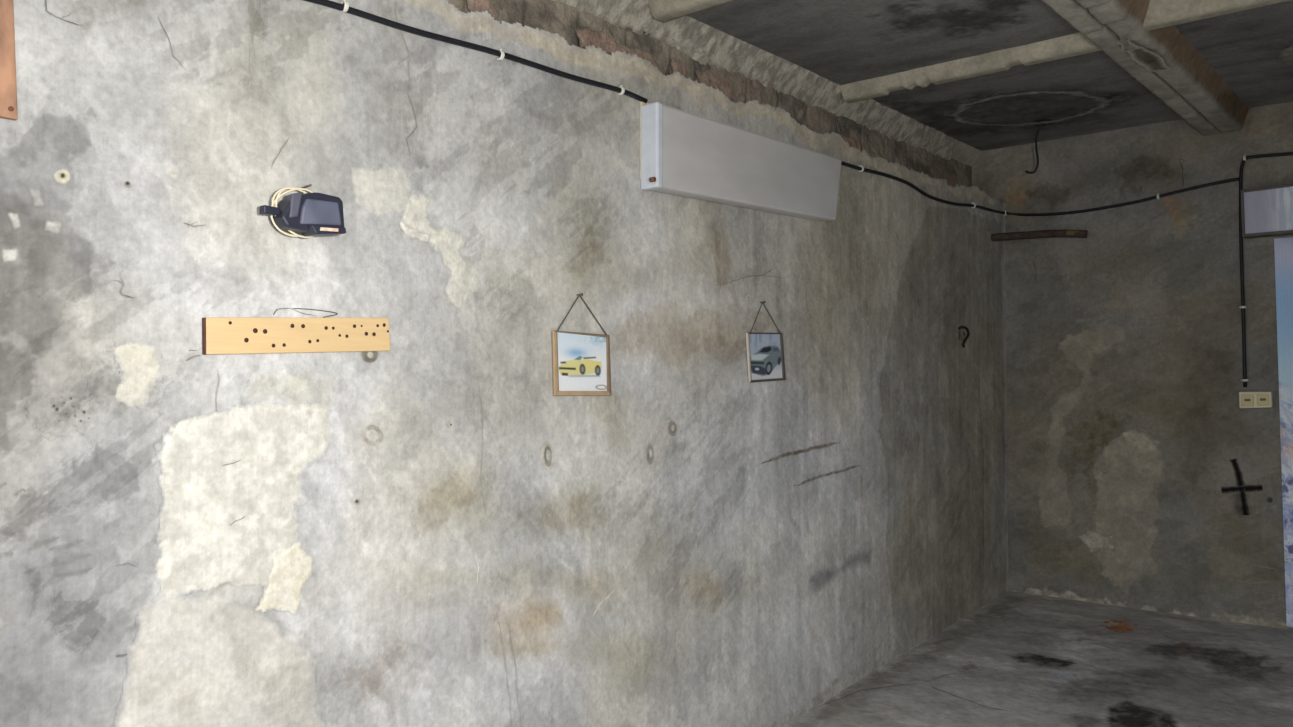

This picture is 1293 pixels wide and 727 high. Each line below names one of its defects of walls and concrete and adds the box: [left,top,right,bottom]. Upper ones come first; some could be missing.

flaking render [394,0,997,207]
damp [765,204,1290,727]
flaking render [255,542,314,614]